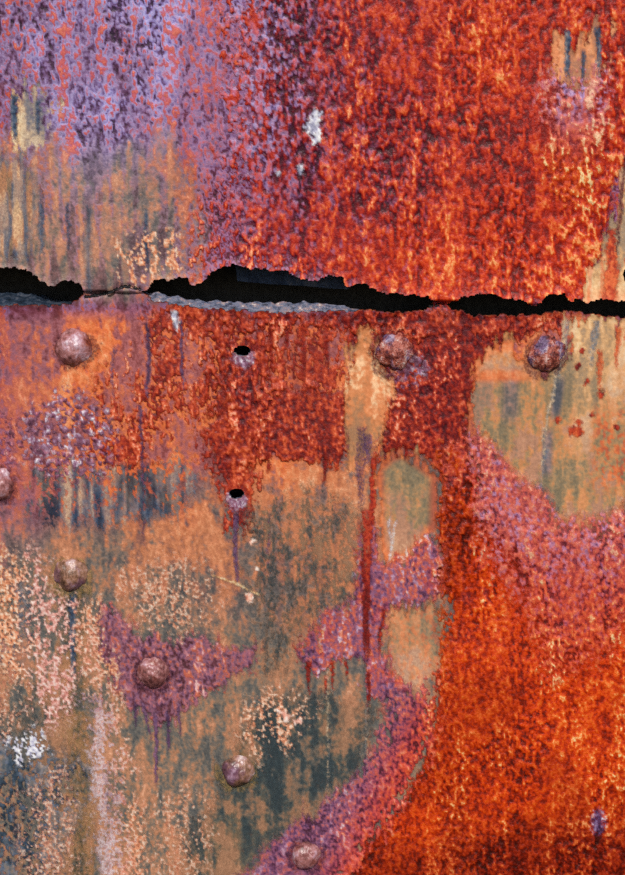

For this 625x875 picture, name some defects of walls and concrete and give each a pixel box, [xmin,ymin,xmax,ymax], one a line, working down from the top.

rust [189,197,205,245]
rust [189,245,206,268]
crack [0,263,625,319]
peeling [583,155,625,303]
rust [602,229,619,300]
rust [583,351,604,399]
peeling [470,312,625,518]
rust [568,412,595,437]
rust [95,601,263,782]